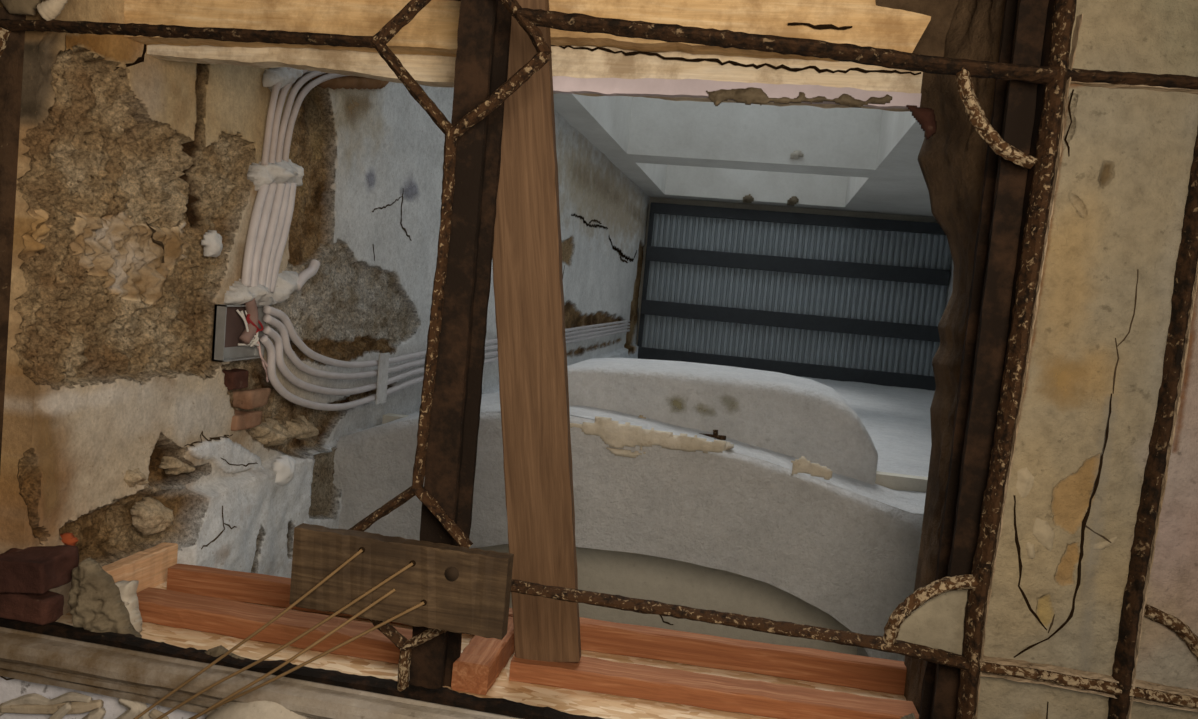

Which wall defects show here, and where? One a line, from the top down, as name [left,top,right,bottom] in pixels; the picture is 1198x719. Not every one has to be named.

crack [551,45,921,75]
spalling [706,87,892,108]
spalling [906,105,937,140]
spalling [11,33,397,520]
spalling [270,74,421,366]
crack [372,189,412,241]
crack [571,213,637,263]
spalling [564,240,645,358]
spalling [18,432,212,567]
peeling [1036,453,1104,628]
crack [1013,269,1139,658]